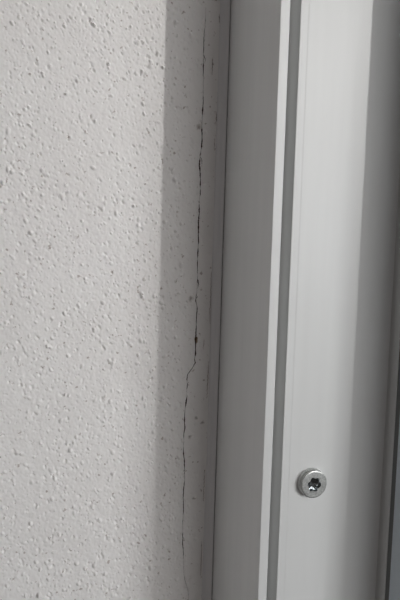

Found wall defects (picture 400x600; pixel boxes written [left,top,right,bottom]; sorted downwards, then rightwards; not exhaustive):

crack [182,97,217,596]